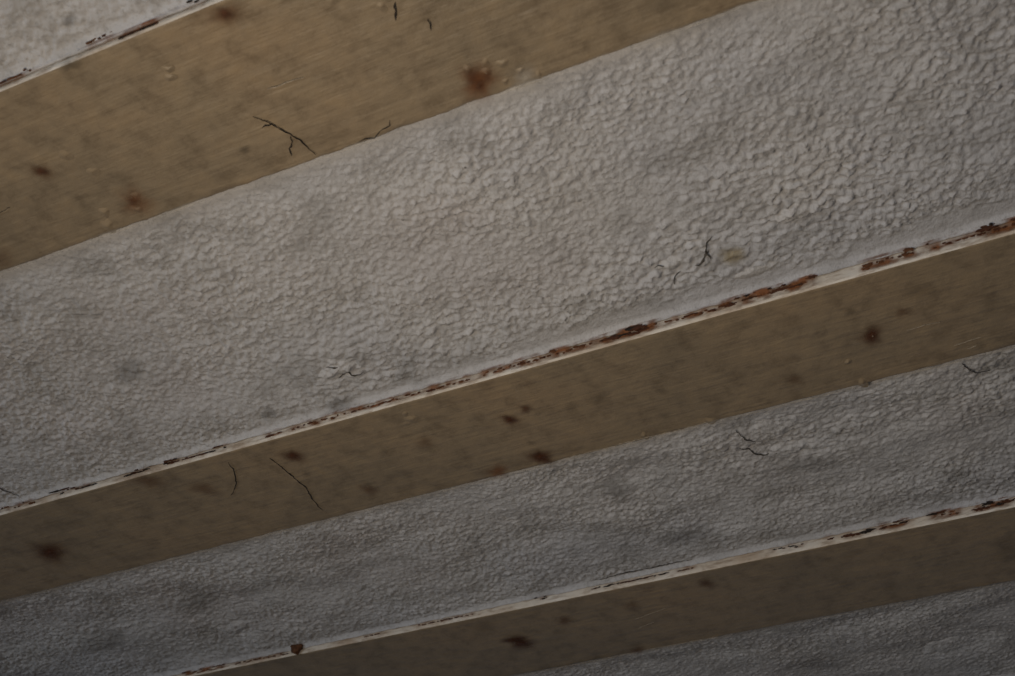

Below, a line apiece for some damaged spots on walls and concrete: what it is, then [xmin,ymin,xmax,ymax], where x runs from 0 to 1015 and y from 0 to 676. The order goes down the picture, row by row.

rust [85,18,159,44]
rust [926,217,1015,251]
rust [861,247,917,271]
rust [926,508,960,518]
rust [972,497,1015,511]
rust [827,518,907,540]